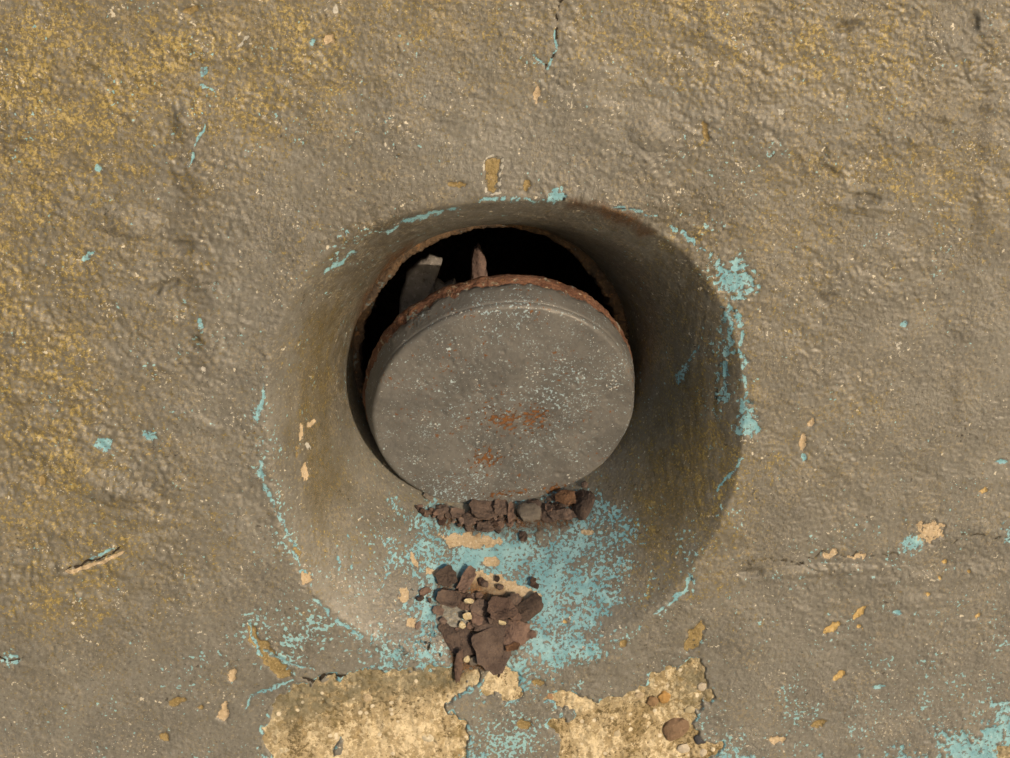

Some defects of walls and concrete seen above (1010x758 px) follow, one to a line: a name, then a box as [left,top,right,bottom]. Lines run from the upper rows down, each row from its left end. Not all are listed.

crack [533,0,563,104]
spalling [481,154,504,196]
corrosion [362,274,633,421]
corrosion [466,401,560,438]
corrosion [463,445,505,473]
spalling [899,520,945,557]
crack [65,546,127,574]
corrosion [444,575,522,636]
spalling [256,487,764,758]
corrosion [450,649,484,683]
peeling [216,701,230,721]
peeling [884,698,1010,758]